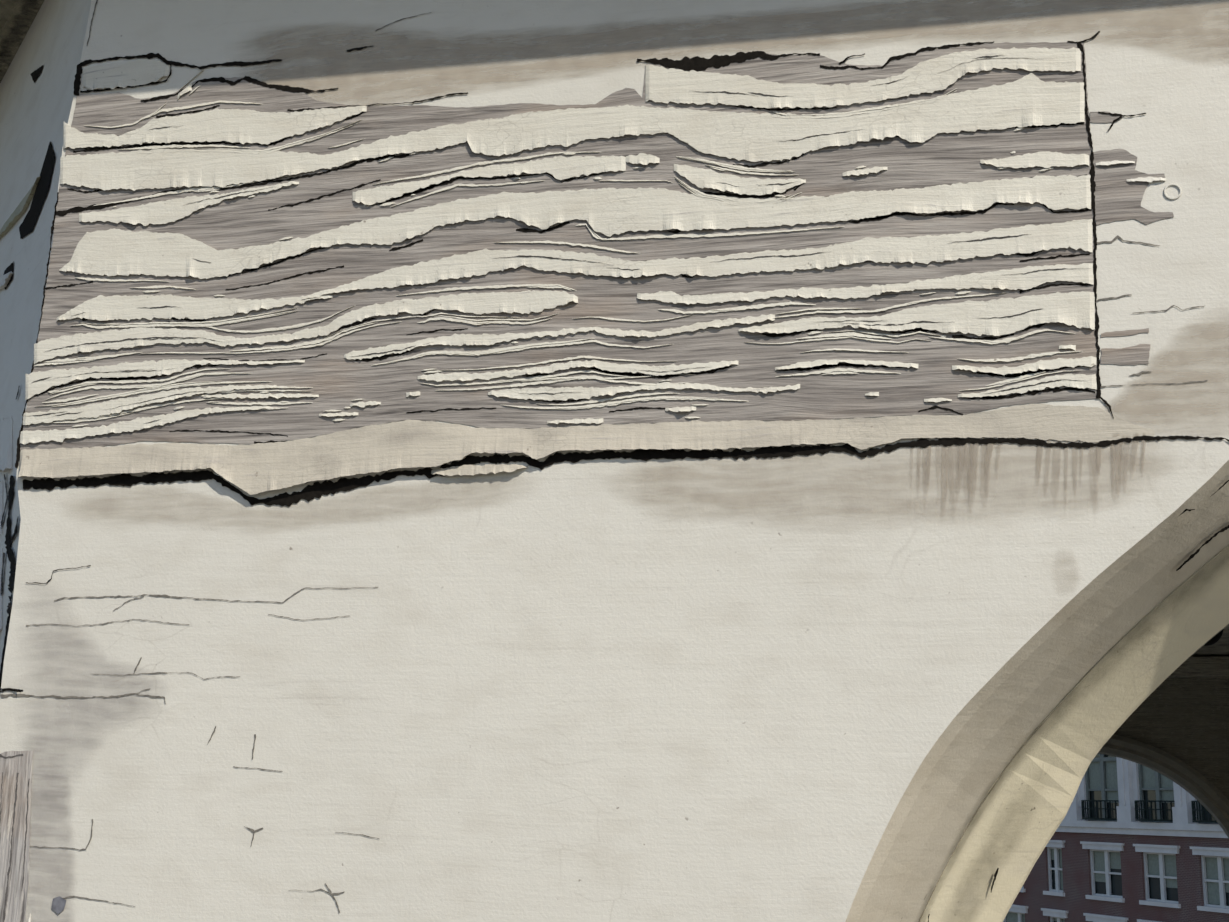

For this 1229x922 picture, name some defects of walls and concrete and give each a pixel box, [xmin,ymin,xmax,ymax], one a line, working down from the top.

leakage [0,0,44,83]
leakage [257,0,1229,101]
peeling [0,42,1174,630]
crack [0,31,1229,704]
peeling [0,750,34,922]
crack [63,896,135,907]
crack [289,883,345,913]